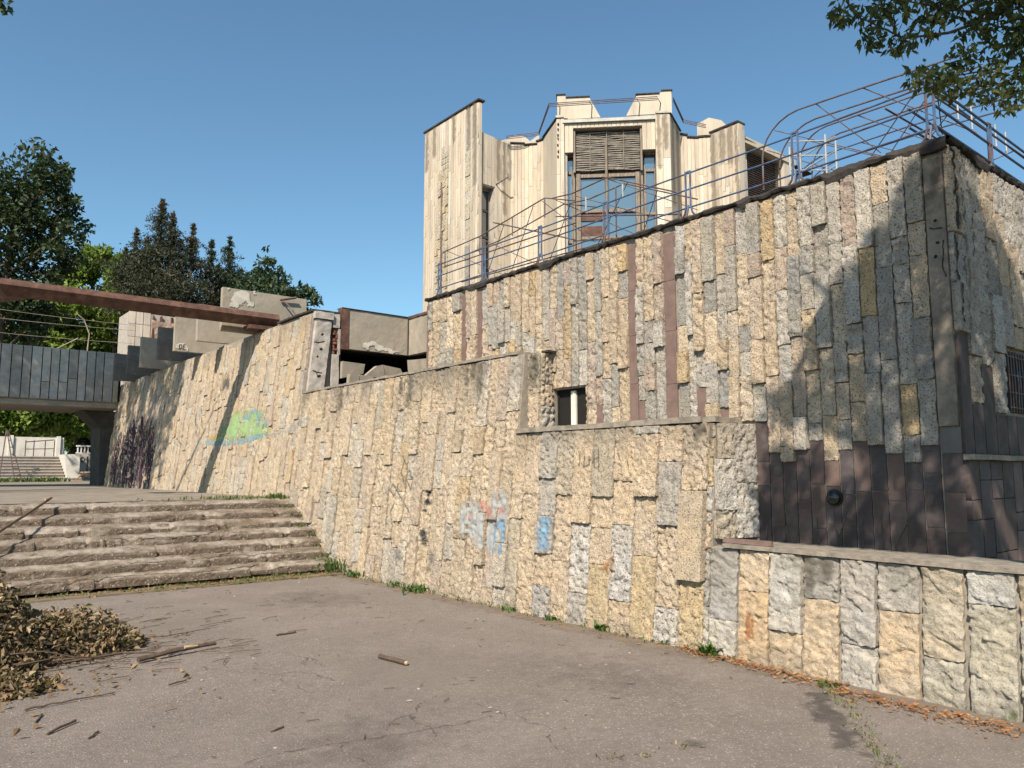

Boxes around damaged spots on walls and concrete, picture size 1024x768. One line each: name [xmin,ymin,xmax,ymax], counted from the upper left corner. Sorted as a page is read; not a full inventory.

peeling [227,288,256,309]
peeling [362,341,399,354]